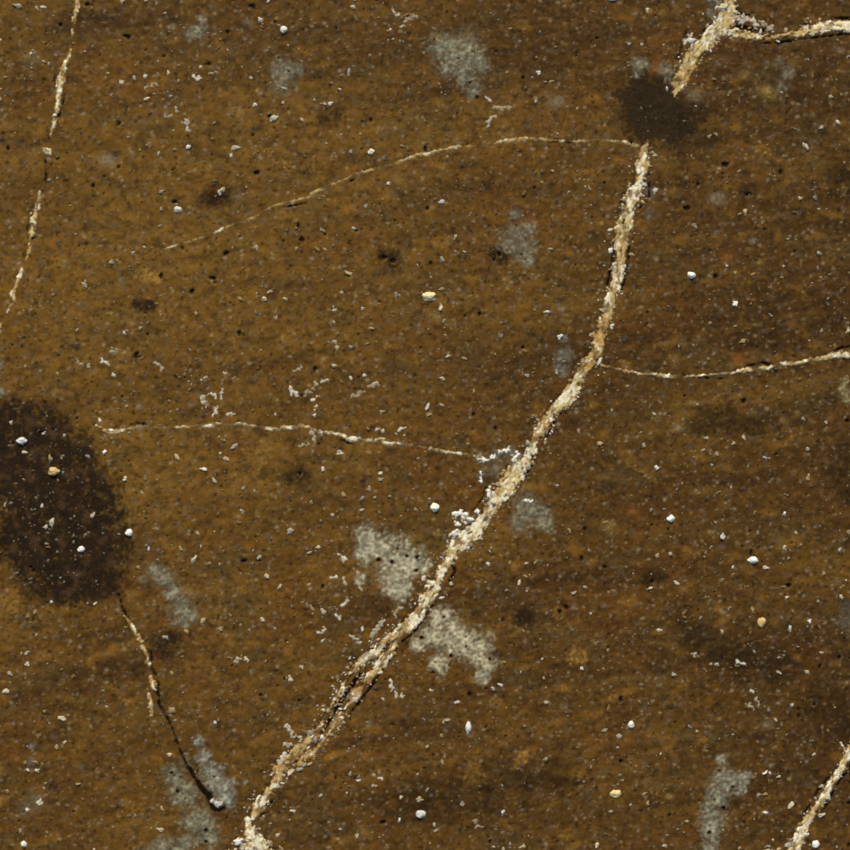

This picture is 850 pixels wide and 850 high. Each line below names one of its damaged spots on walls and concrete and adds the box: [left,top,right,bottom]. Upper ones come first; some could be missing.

crack [670,0,850,97]
crack [0,0,80,333]
crack [160,168,375,251]
crack [493,137,588,145]
water stain [617,70,700,145]
crack [95,418,146,439]
crack [175,405,406,455]
water stain [0,397,132,607]
crack [240,139,850,850]
crack [118,594,226,812]